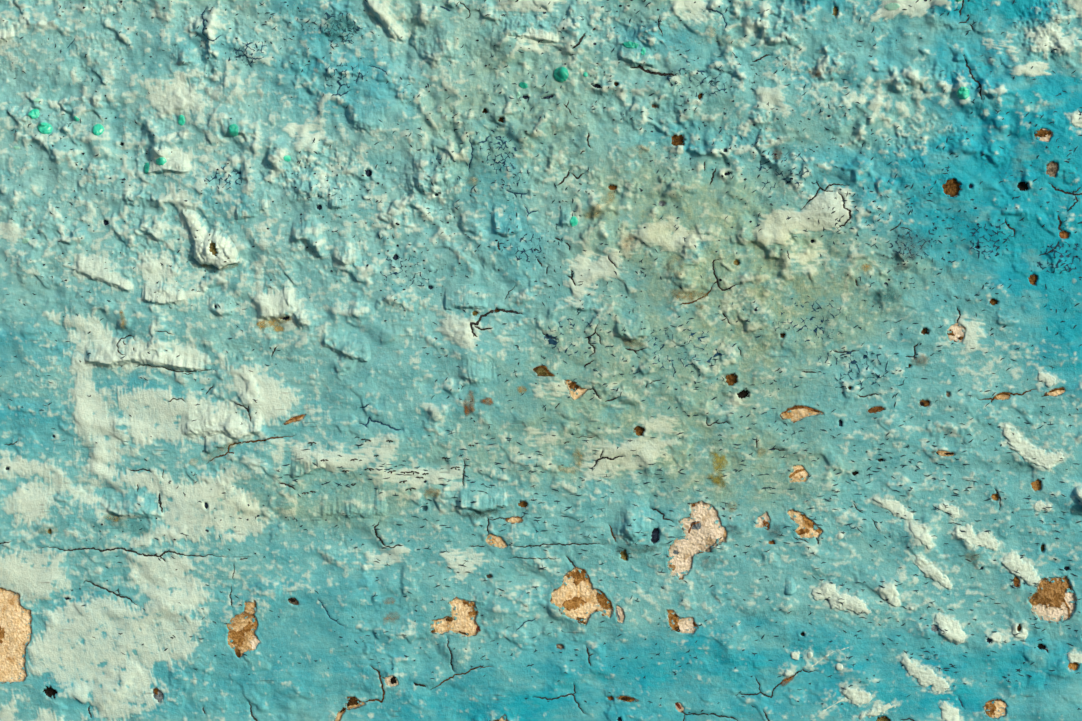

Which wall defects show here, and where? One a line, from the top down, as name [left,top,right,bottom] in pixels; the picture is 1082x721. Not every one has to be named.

crack [6,101,111,363]
spalling [780,405,824,423]
crack [38,458,266,624]
spalling [667,501,729,580]
spalling [0,588,32,684]
spalling [226,600,260,658]
spalling [430,597,481,637]
spalling [550,567,624,626]
spalling [1013,576,1077,624]